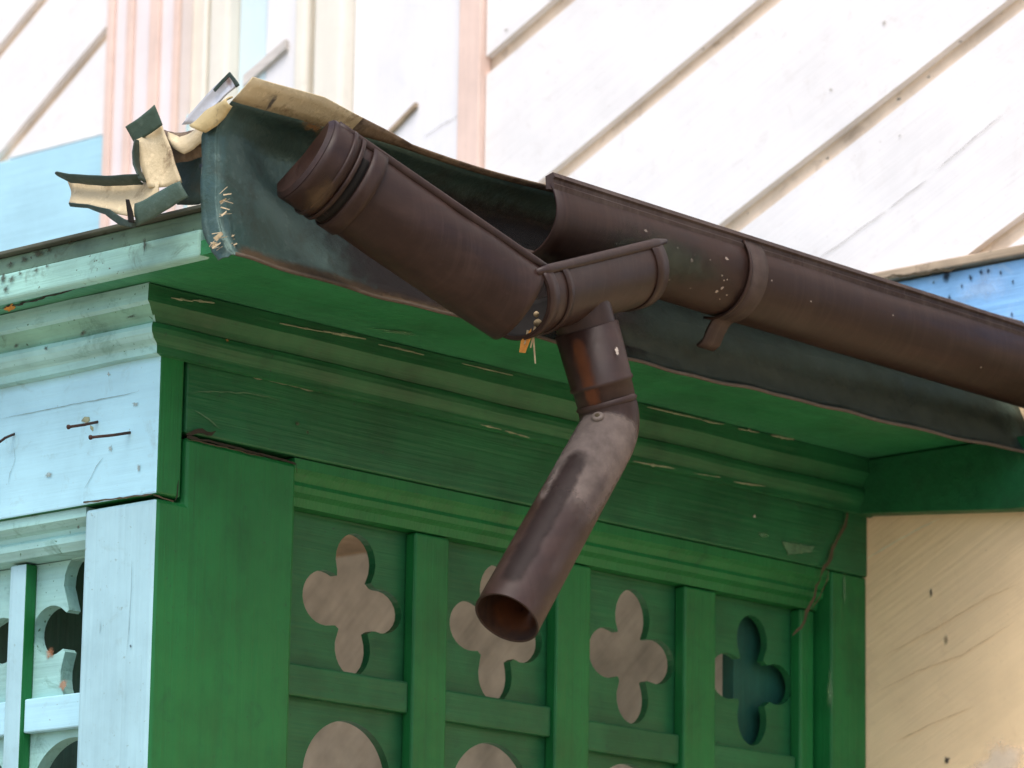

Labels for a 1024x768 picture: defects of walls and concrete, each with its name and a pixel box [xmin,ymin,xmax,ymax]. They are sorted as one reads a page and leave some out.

peeling [280,323,366,339]
crack [186,377,320,469]
crack [792,512,848,636]